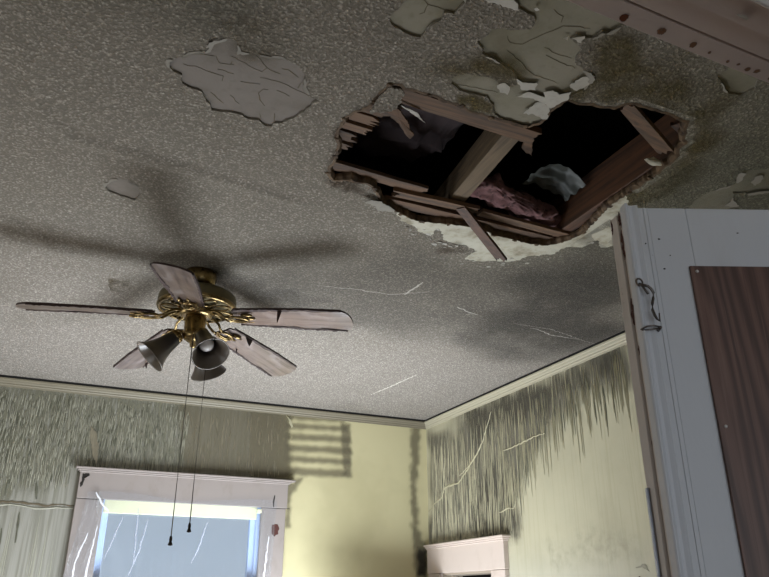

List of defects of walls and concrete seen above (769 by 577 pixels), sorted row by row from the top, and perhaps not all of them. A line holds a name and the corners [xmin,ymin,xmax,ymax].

peeling [390,0,466,36]
peeling [451,0,622,125]
peeling [688,169,769,209]
peeling [364,196,629,268]
peeling [0,387,282,498]
crack [0,330,625,511]
crack [0,483,105,544]